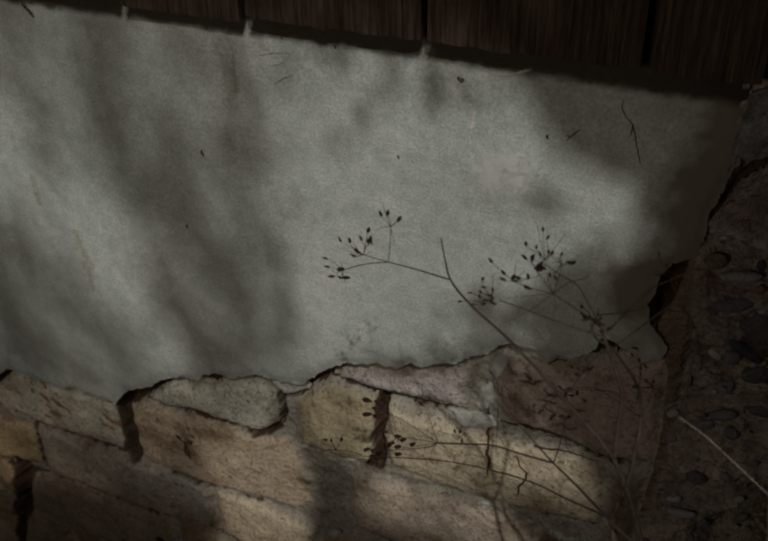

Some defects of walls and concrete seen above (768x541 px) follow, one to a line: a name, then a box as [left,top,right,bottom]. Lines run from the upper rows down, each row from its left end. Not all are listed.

peeling [451,344,559,429]